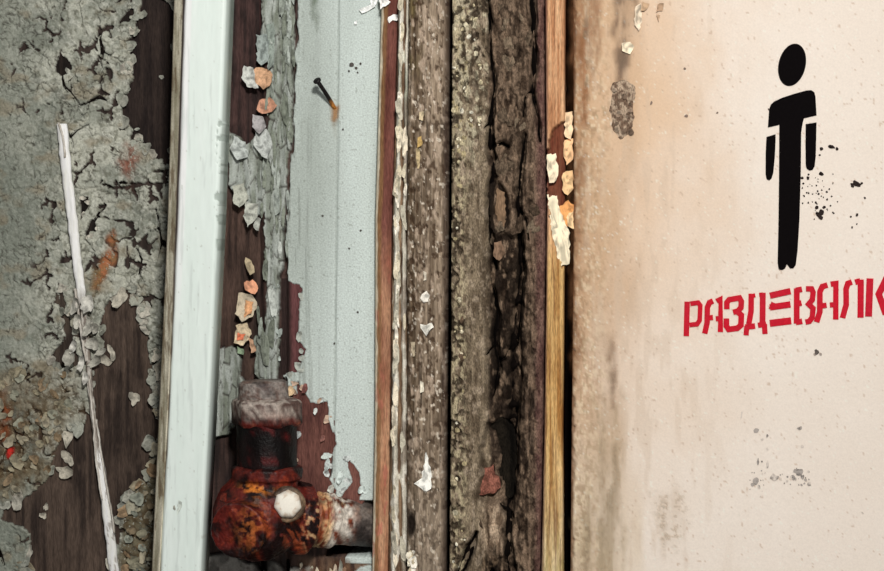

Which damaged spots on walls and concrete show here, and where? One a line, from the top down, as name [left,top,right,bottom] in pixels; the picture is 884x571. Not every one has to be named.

peeling [51,51,72,75]
peeling [116,0,174,164]
leakage [618,49,626,72]
peeling [77,196,104,239]
peeling [220,0,367,504]
spalling [546,111,574,266]
peeling [0,283,162,571]